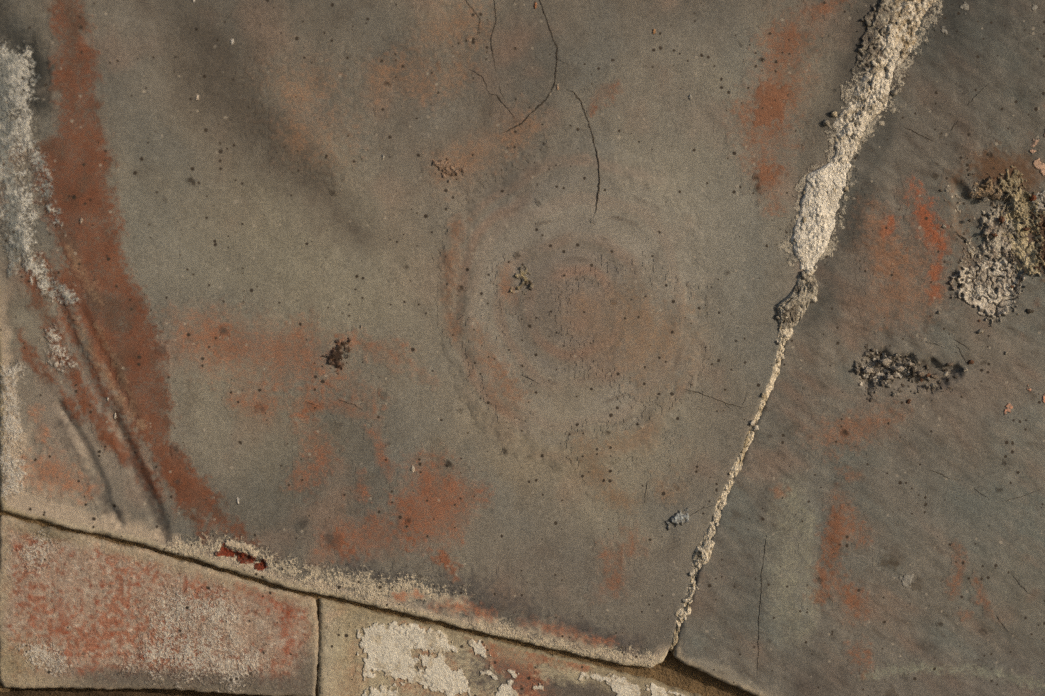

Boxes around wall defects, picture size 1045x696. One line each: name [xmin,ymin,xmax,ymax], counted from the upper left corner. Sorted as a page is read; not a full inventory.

damp [0,0,148,431]
damp [110,0,407,278]
corrosion [12,0,508,575]
crack [466,0,600,218]
corrosion [714,0,860,221]
spalling [931,134,1045,334]
crack [1009,249,1027,297]
damp [0,359,31,502]
spalling [214,539,268,571]
damp [55,412,661,696]
peeling [353,620,545,696]
crack [757,537,767,677]